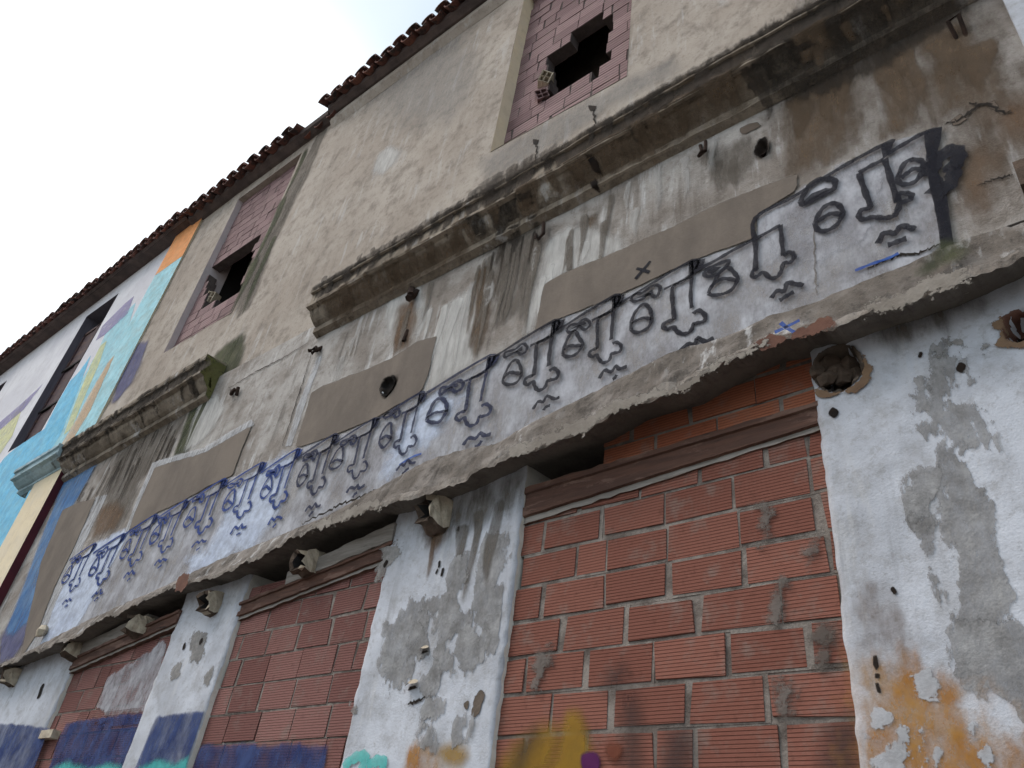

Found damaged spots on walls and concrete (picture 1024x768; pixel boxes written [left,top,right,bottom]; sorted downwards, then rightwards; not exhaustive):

leakage [313,0,1024,388]
crack [946,102,1013,124]
crack [978,174,1013,185]
spalling [504,316,837,458]
hole [809,344,873,418]
spalling [981,309,1024,355]
peeling [900,336,1024,722]
peeling [374,531,512,755]